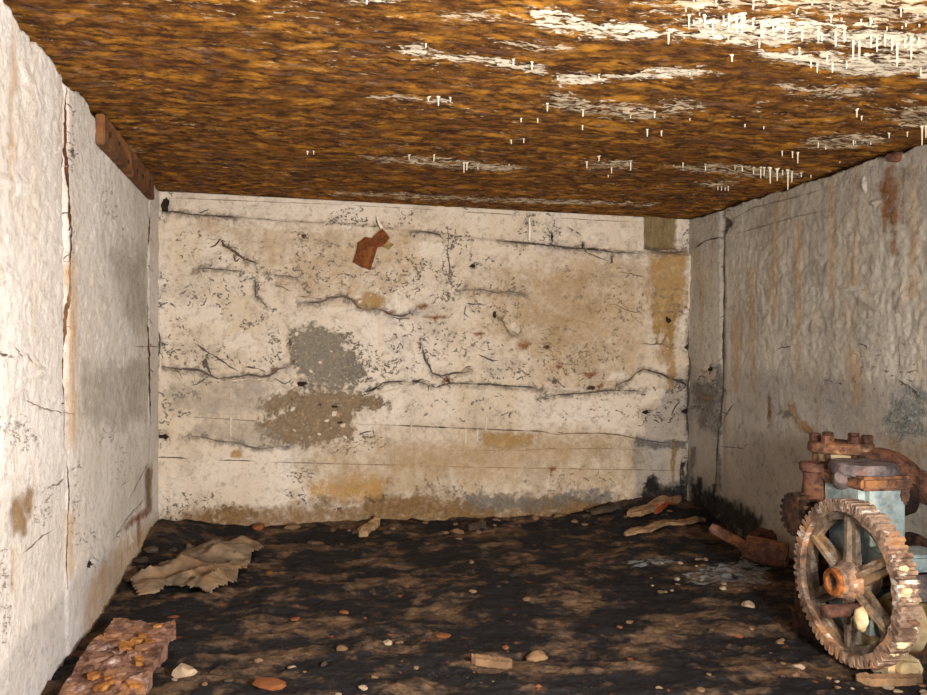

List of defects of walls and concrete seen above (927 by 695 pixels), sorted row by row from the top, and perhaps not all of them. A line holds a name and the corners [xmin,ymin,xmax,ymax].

efflorescence [366,0,927,122]
efflorescence [359,155,526,173]
efflorescence [798,132,887,150]
rust [881,167,905,255]
crack [22,88,75,588]
crack [197,239,413,319]
spalling [158,206,717,455]
leakage [328,190,689,389]
crack [355,310,691,499]
crack [496,217,749,484]
rust [127,501,150,544]
leakage [177,478,611,527]